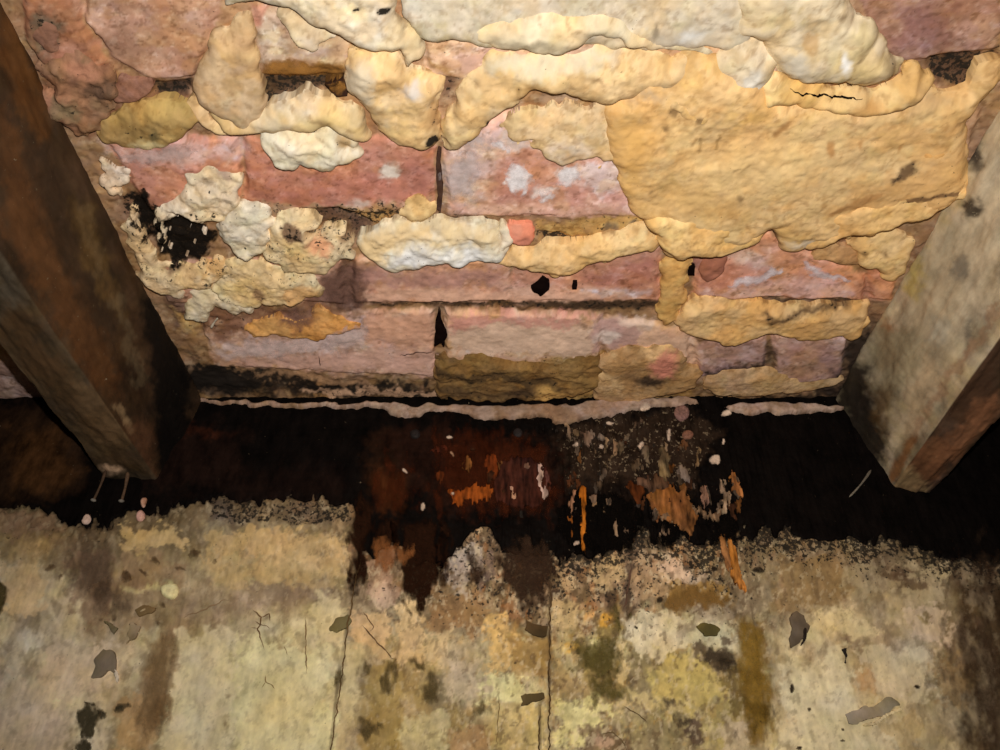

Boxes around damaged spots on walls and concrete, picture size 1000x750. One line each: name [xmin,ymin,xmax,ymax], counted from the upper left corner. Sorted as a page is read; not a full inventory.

crack [794,91,861,100]
leakage [124,188,218,269]
leakage [345,463,453,615]
leakage [556,490,677,555]
leakage [705,509,739,544]
leakage [498,536,558,610]
peeling [91,649,119,683]
crack [330,563,393,750]
crack [538,564,552,750]
peeling [789,611,810,648]
leakage [75,702,129,750]
peeling [845,697,902,727]